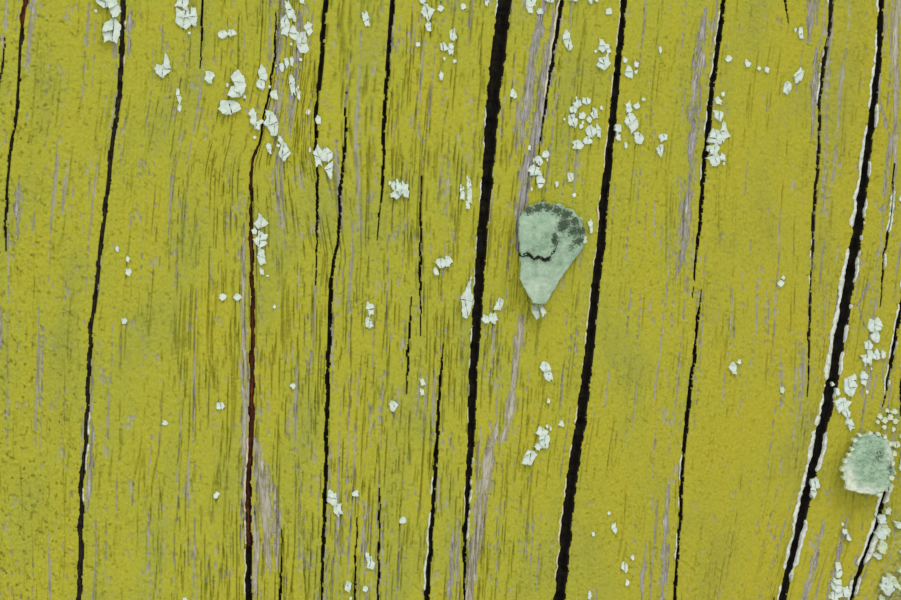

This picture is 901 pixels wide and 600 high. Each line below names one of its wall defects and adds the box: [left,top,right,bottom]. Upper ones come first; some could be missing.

crack [76,0,126,600]
peeling [94,0,134,53]
peeling [217,0,313,161]
crack [313,0,347,600]
crack [462,0,512,600]
peeling [465,0,593,600]
peeling [563,96,603,150]
crack [553,0,627,600]
crack [673,0,726,600]
peeling [687,9,731,166]
crack [773,0,901,600]
peeling [830,284,901,497]